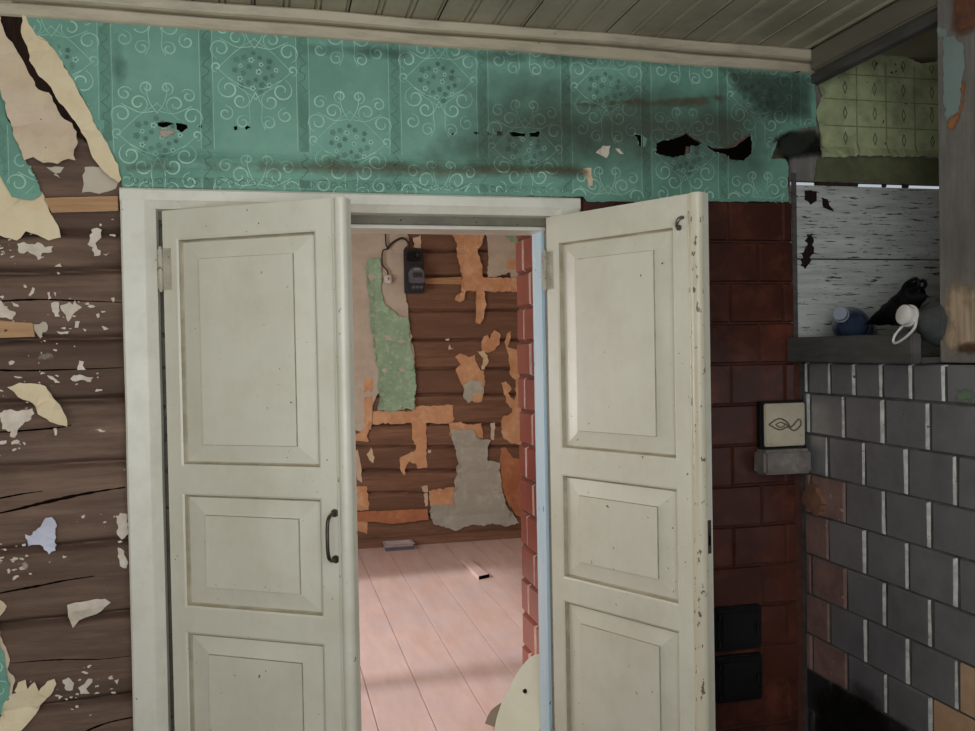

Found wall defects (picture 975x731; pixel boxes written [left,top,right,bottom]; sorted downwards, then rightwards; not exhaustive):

peeling [937,27,965,120]
leakage [732,72,806,114]
leakage [511,97,744,155]
peeling [804,190,833,211]
peeling [801,234,814,269]
peeling [47,292,60,317]
peeling [943,285,975,351]
peeling [118,548,128,568]
peeling [78,679,92,694]